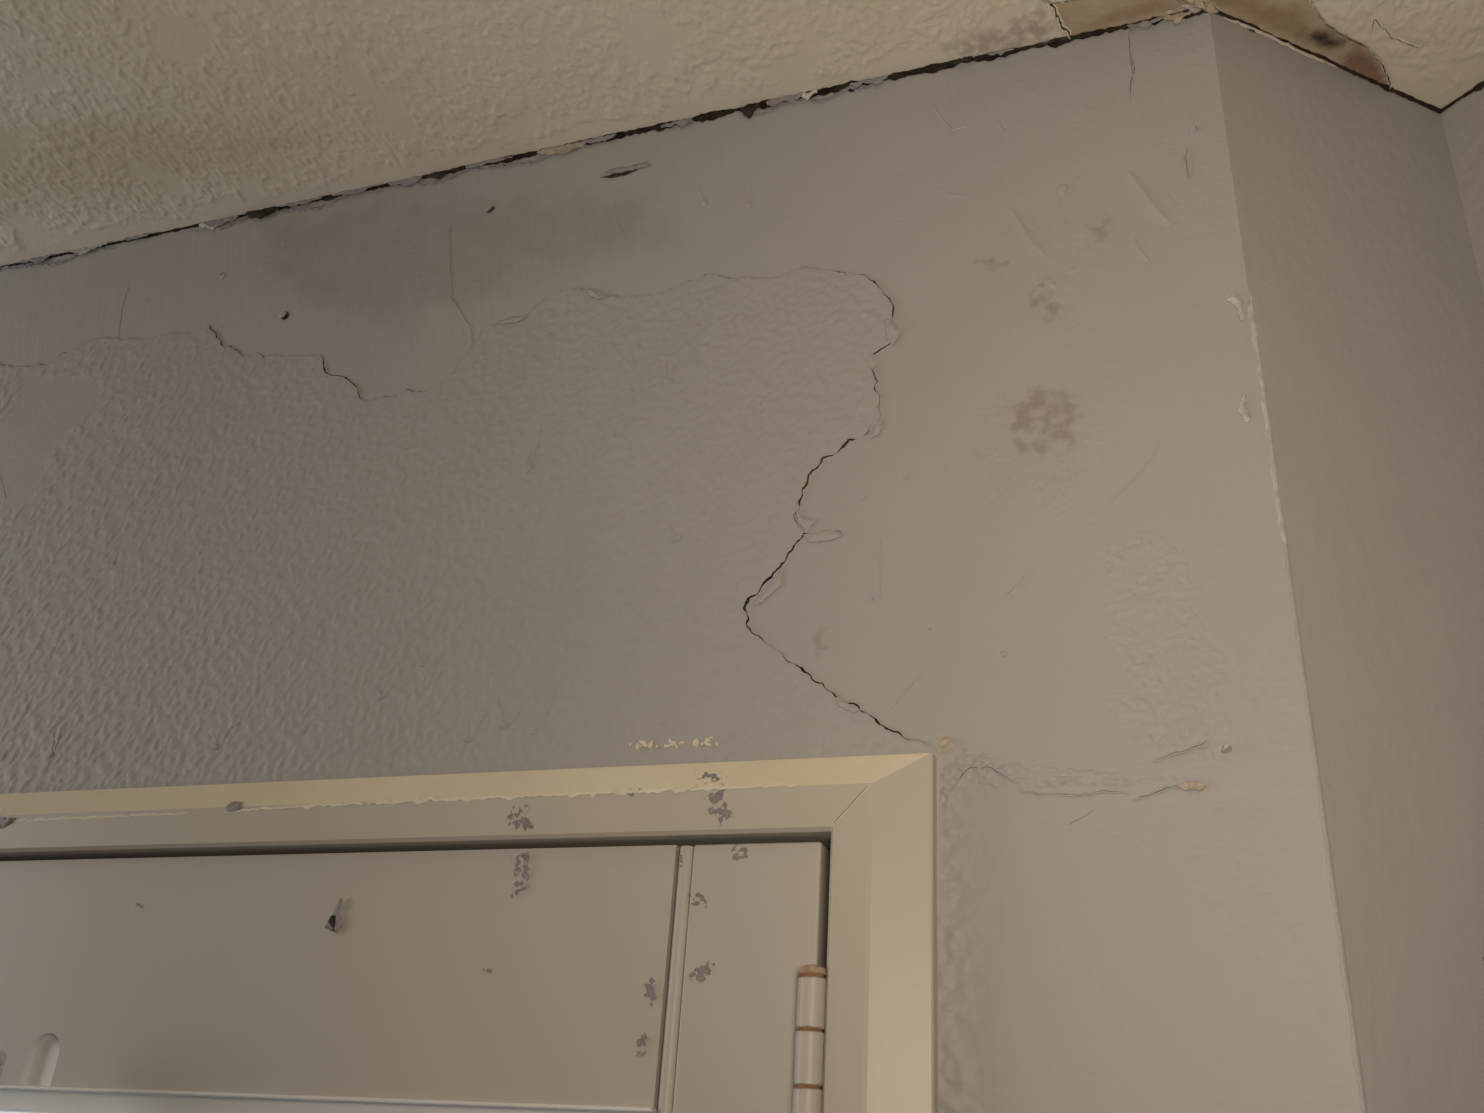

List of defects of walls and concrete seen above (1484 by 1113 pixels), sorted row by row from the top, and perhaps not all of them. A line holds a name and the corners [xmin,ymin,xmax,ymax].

peeling [1041,0,1185,39]
peeling [1205,0,1392,89]
crack [0,8,1484,271]
peeling [317,355,459,401]
peeling [740,266,930,746]
peeling [0,817,15,829]
peeling [225,801,243,812]